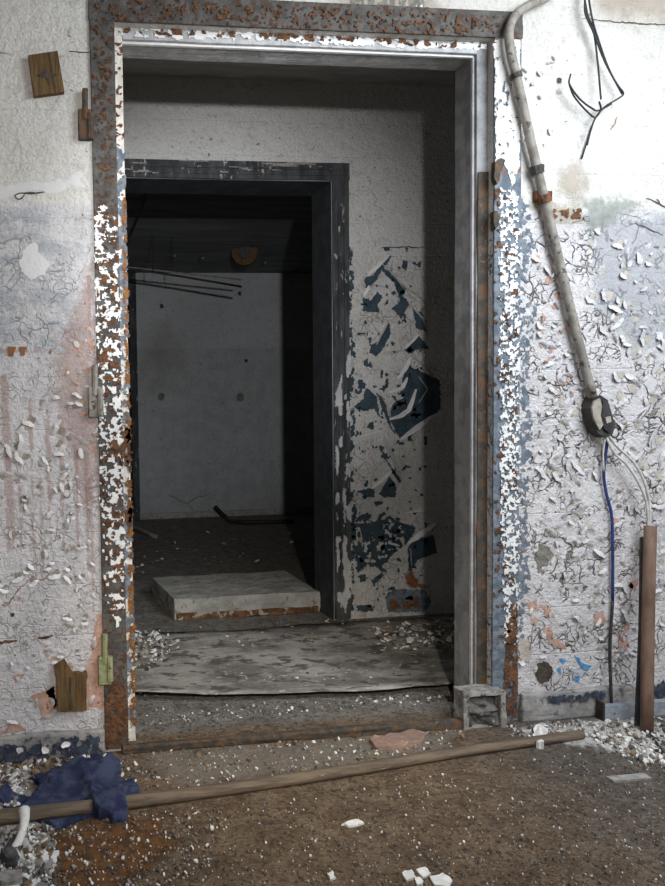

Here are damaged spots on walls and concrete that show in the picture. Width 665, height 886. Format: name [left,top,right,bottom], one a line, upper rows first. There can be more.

peeling [114,28,405,54]
peeling [0,67,159,730]
peeling [335,246,441,613]
peeling [416,39,645,703]
peeling [585,227,665,416]
peeling [628,427,665,509]
peeling [0,719,103,764]
peeling [654,680,665,699]